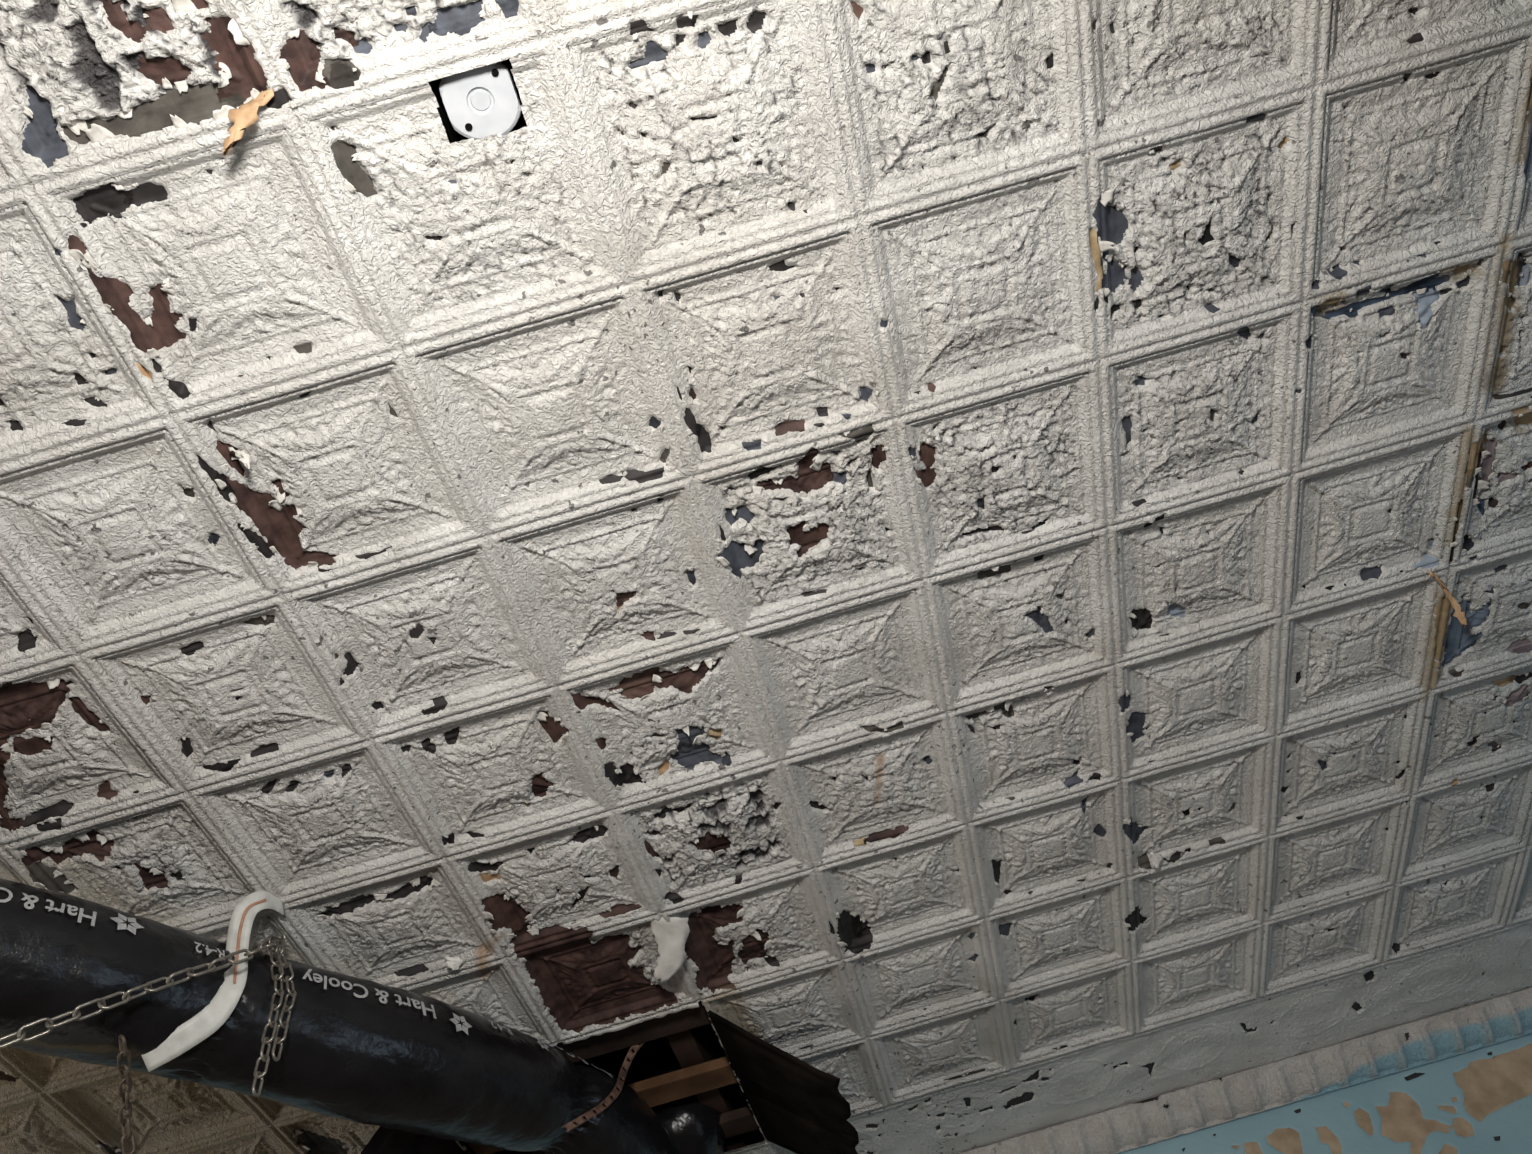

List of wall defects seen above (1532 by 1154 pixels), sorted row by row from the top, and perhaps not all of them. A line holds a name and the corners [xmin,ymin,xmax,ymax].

peeling [394,0,519,43]
peeling [55,182,197,399]
peeling [1089,188,1144,321]
peeling [1305,241,1484,349]
peeling [62,353,117,427]
peeling [197,419,392,572]
peeling [716,407,889,579]
peeling [1400,388,1532,677]
peeling [0,678,186,894]
peeling [537,658,720,743]
peeling [595,726,732,790]
peeling [468,861,780,1033]